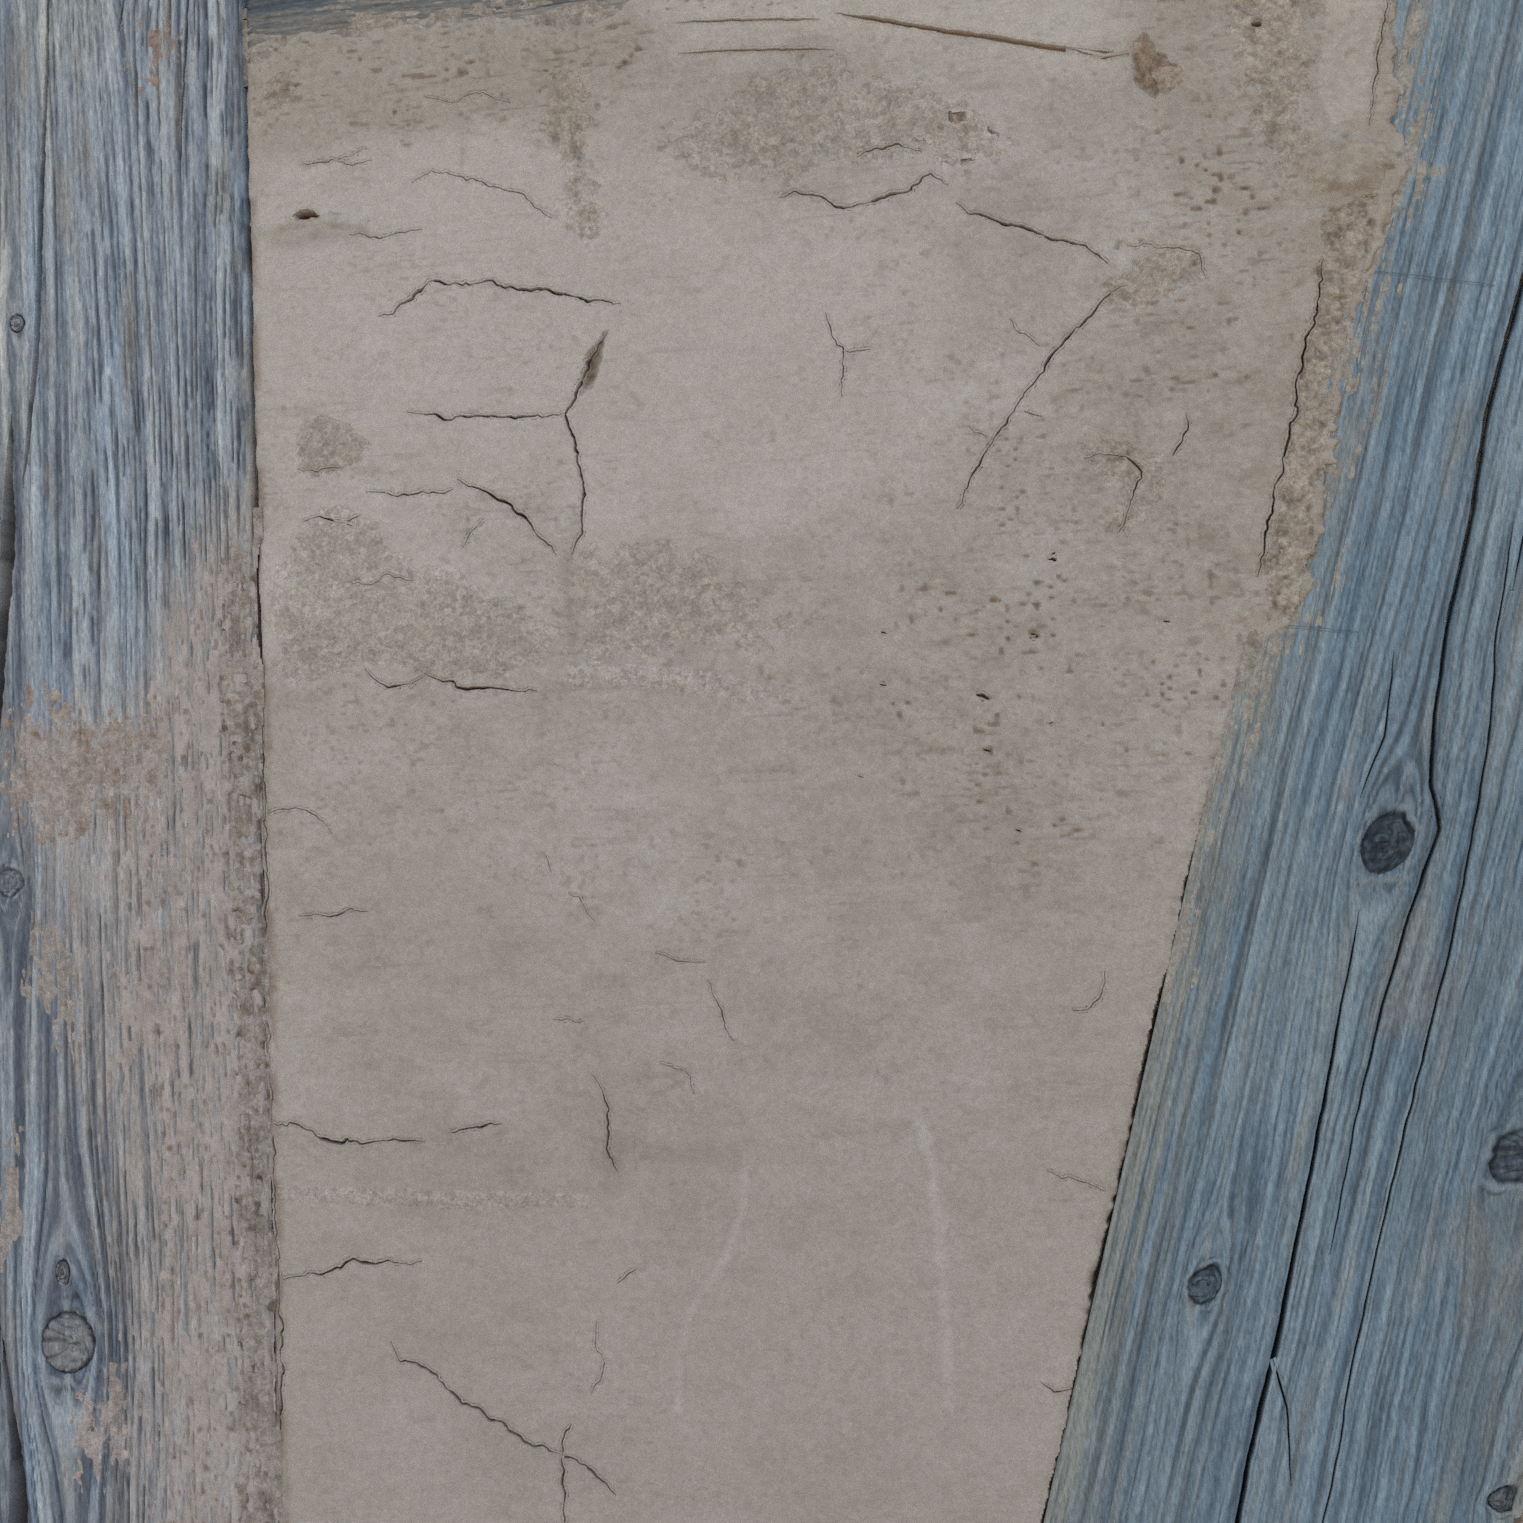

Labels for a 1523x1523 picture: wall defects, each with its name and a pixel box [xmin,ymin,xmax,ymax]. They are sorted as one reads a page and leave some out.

spalling [1130,32,1185,99]
spalling [1228,0,1325,189]
crack [349,228,422,241]
crack [297,278,621,556]
crack [411,168,552,219]
crack [779,141,1207,510]
spalling [1077,440,1167,539]
spalling [1257,194,1379,625]
spalling [975,691,990,701]
crack [261,725,502,1523]
crack [616,1268,638,1285]
crack [390,1321,617,1523]